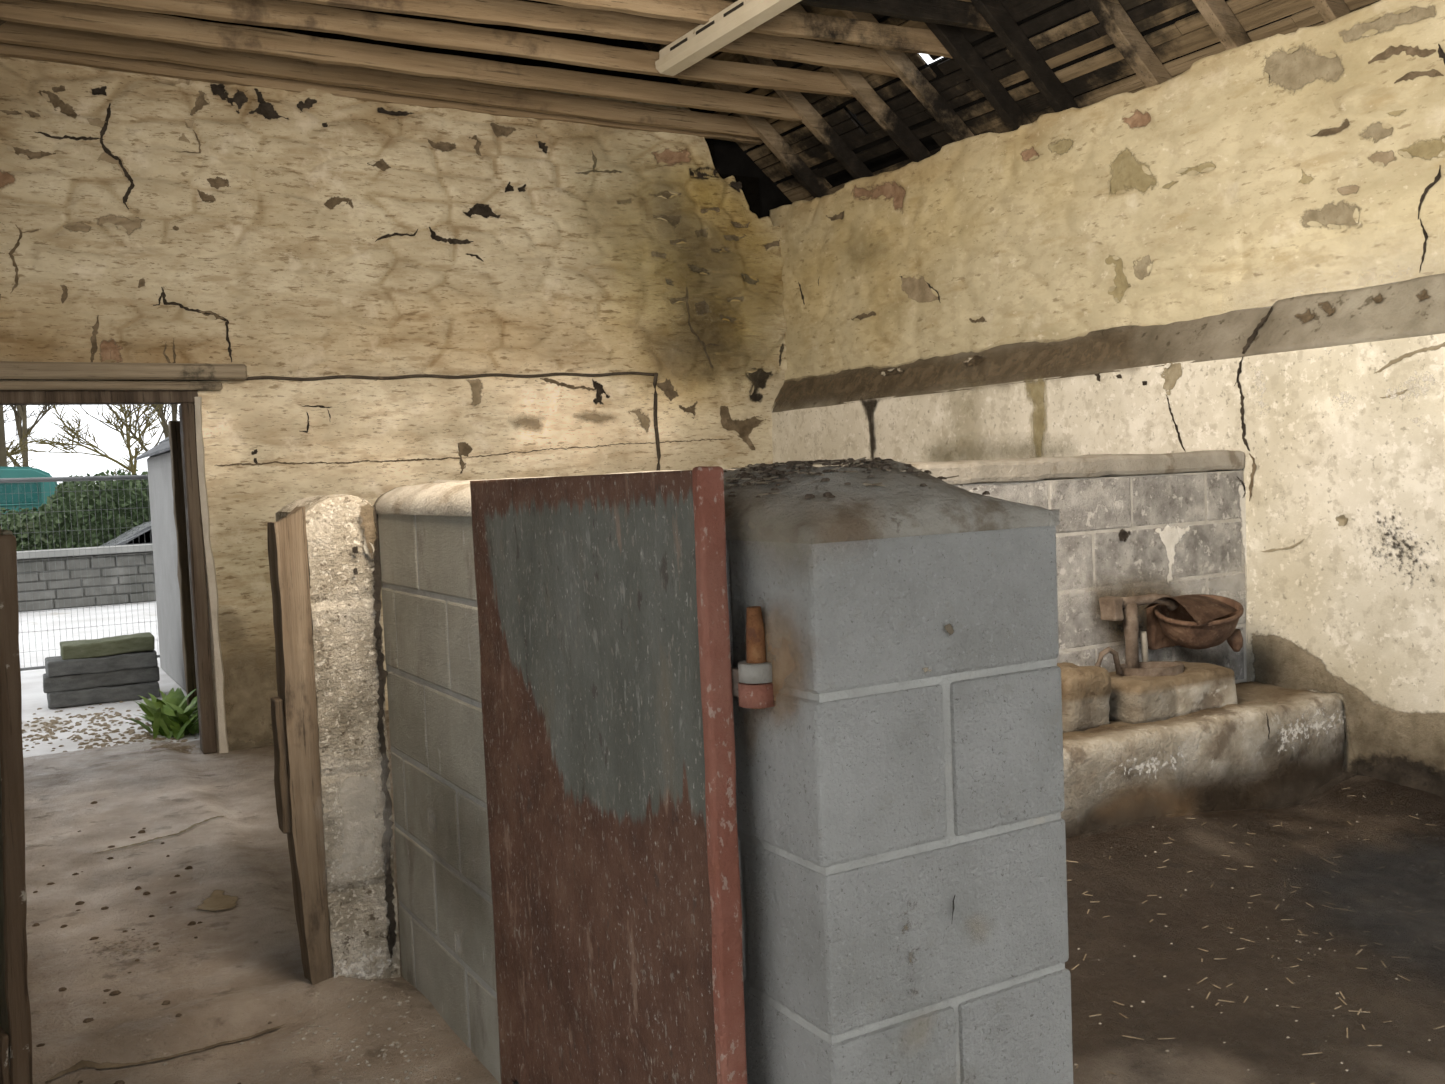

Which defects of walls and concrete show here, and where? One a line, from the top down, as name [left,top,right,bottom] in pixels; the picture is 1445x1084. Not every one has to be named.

peeling [1264,6,1436,92]
crack [1368,44,1445,84]
spalling [7,145,56,160]
crack [35,103,135,209]
spalling [853,182,906,210]
peeling [1107,148,1216,195]
peeling [1302,185,1362,229]
crack [1418,167,1441,273]
crack [153,287,232,363]
crack [1234,306,1273,501]
water stain [1155,525,1190,584]
water stain [1370,503,1433,585]